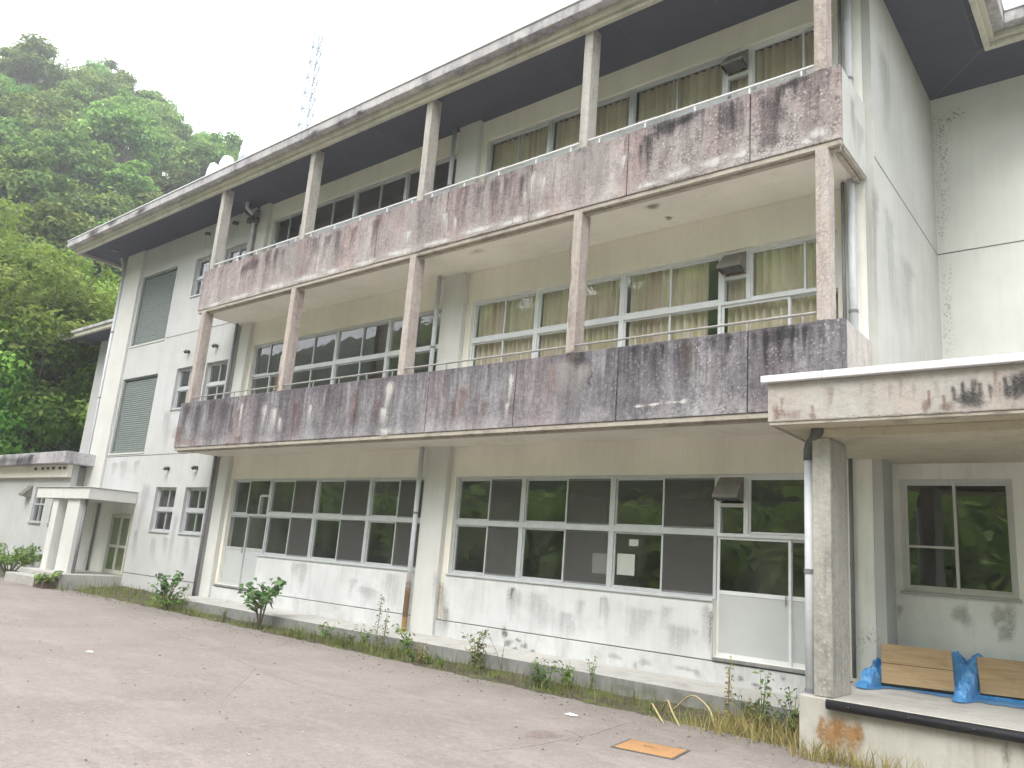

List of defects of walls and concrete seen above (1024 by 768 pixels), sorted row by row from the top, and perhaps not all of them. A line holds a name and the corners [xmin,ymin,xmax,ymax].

water stain [801,127,828,145]
water stain [635,148,747,190]
water stain [207,172,550,308]
water stain [262,405,281,430]
water stain [380,382,393,436]
rust [819,720,863,748]